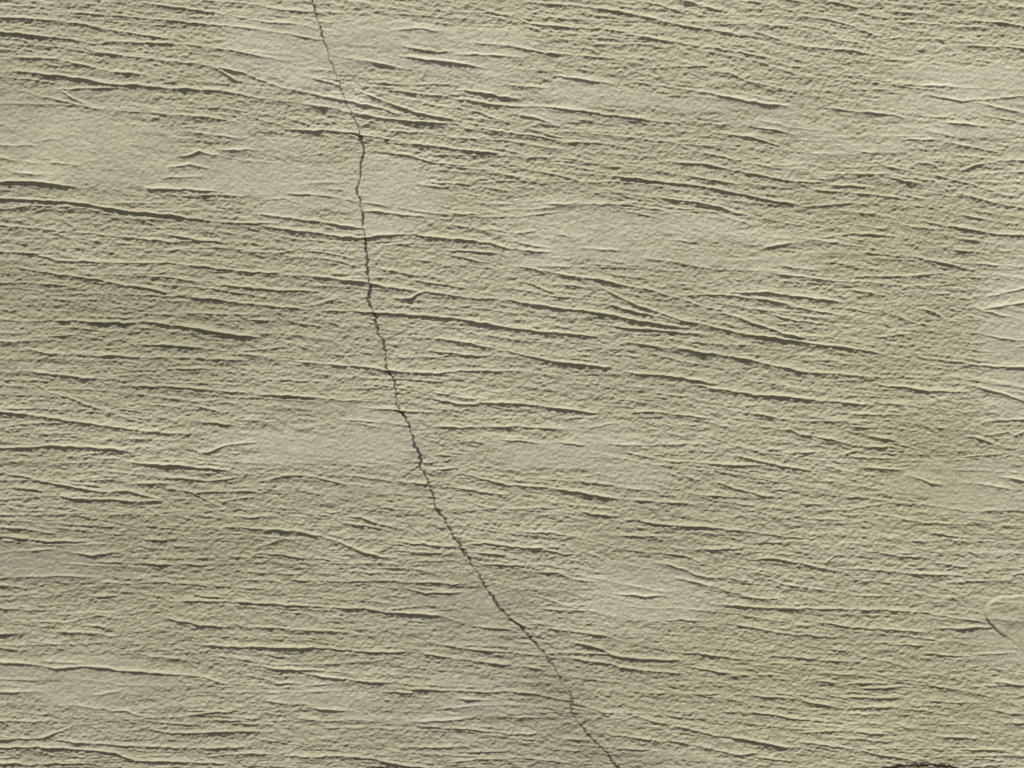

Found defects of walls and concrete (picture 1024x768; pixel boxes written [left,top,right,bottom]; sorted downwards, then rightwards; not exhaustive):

crack [311,0,620,768]